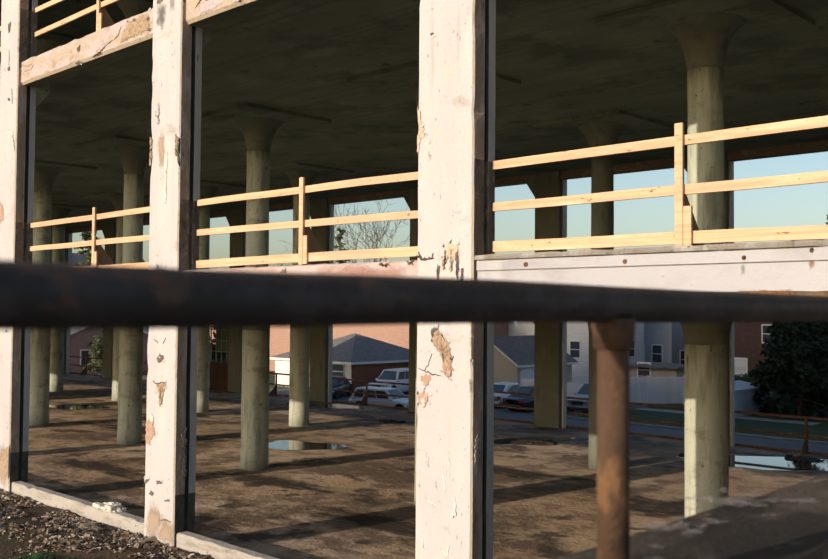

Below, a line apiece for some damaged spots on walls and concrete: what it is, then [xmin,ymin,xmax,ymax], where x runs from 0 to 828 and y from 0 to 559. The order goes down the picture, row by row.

peeling [198,0,241,15]
spalling [436,239,463,278]
spalling [430,324,455,381]
spalling [153,380,167,406]
peeling [416,374,432,407]
peeling [145,413,155,445]